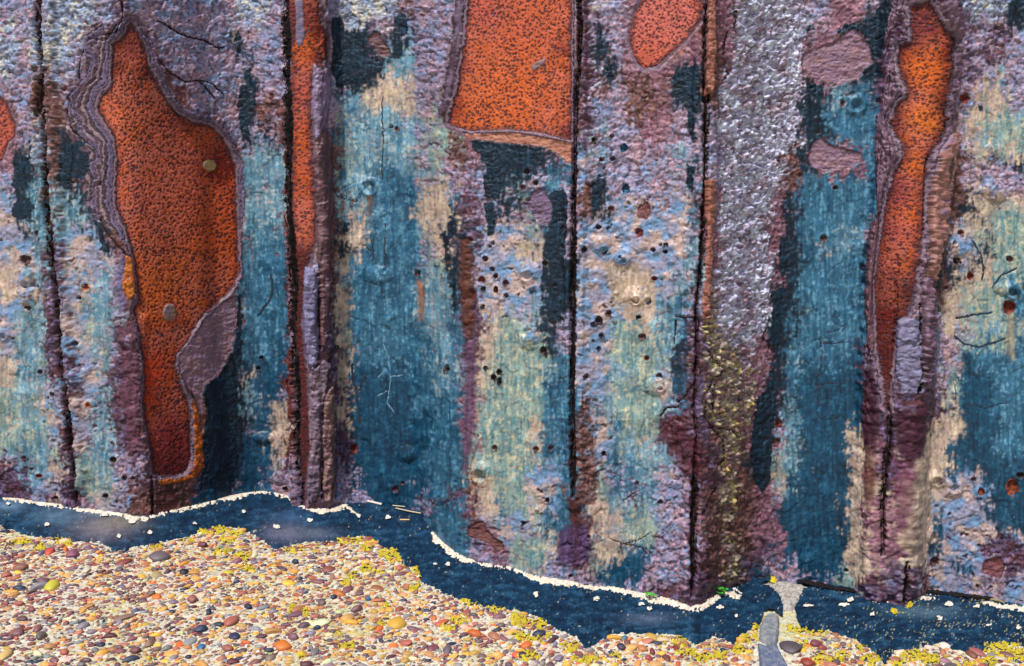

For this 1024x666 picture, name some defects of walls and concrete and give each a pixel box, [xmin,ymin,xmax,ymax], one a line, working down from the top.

corrosion [0,98,15,160]
crack [157,20,225,49]
crack [158,59,224,99]
corrosion [438,0,577,143]
corrosion [628,0,717,96]
corrosion [68,17,245,485]
corrosion [288,0,337,507]
corrosion [862,0,965,507]
crack [952,240,1017,409]